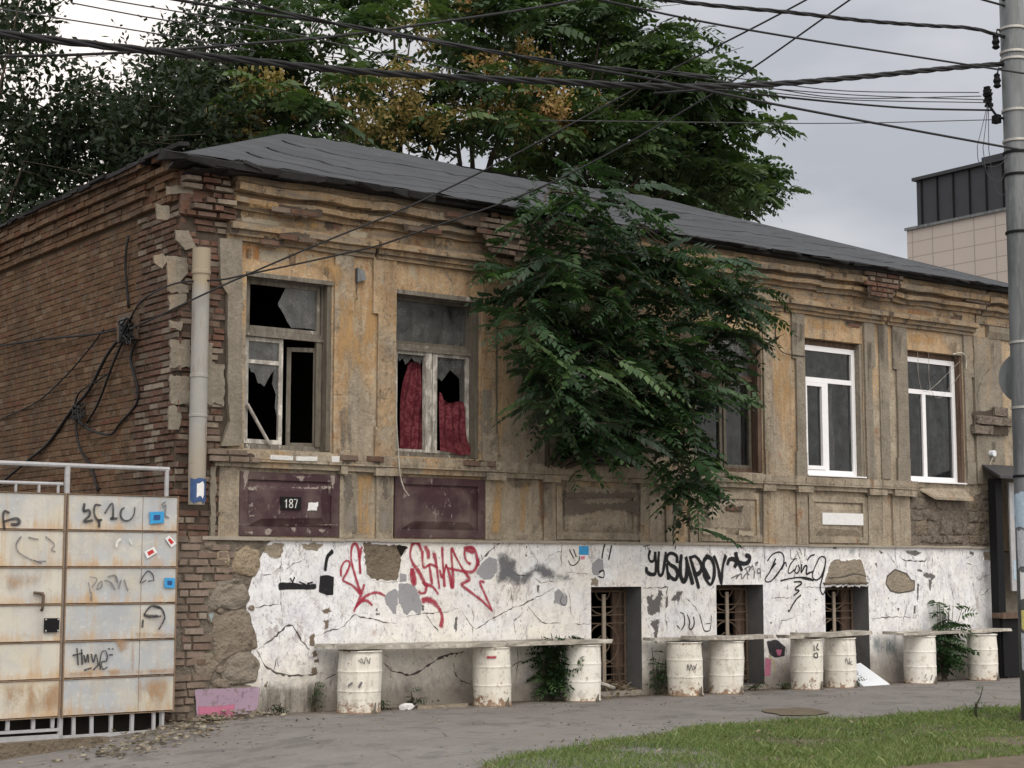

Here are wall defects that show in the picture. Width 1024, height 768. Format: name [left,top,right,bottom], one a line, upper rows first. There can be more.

spalling [864,270,904,300]
spalling [292,455,409,583]
spalling [906,486,990,562]
spalling [168,515,285,724]
peeling [309,608,331,675]
crack [256,543,586,692]
spalling [886,569,935,613]